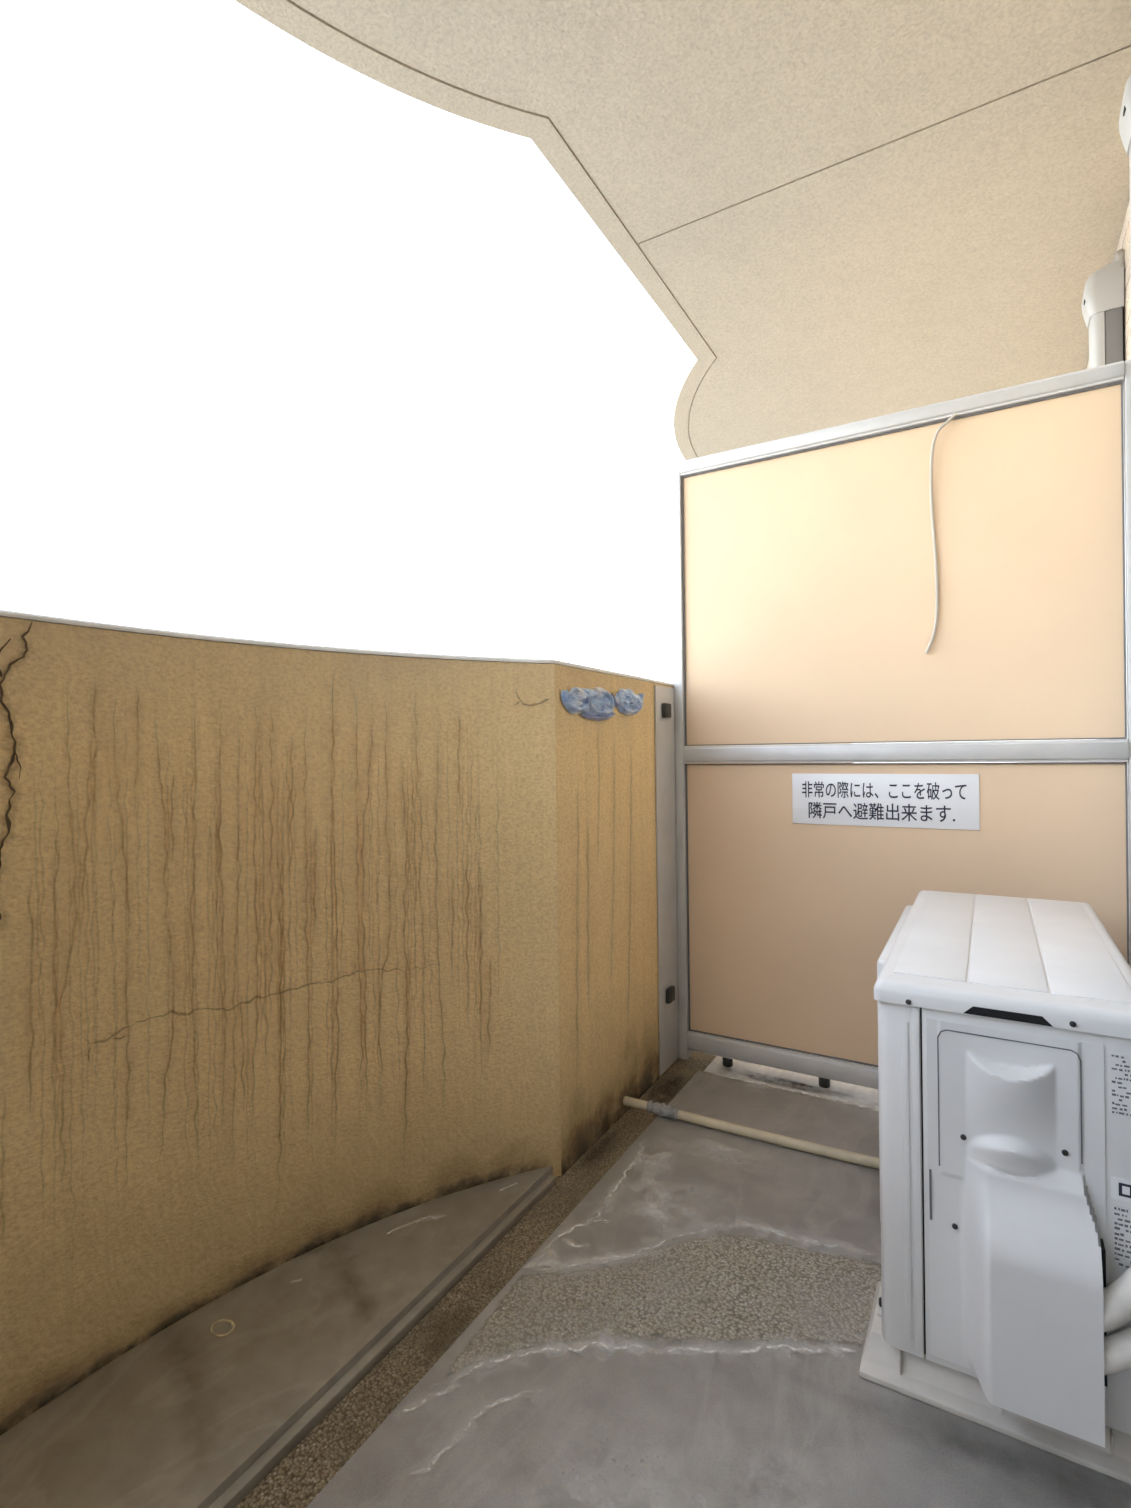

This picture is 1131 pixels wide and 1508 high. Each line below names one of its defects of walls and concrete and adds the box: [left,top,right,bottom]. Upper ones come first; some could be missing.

crack [0,622,32,868]
damp [293,1205,433,1259]
damp [543,1151,672,1270]